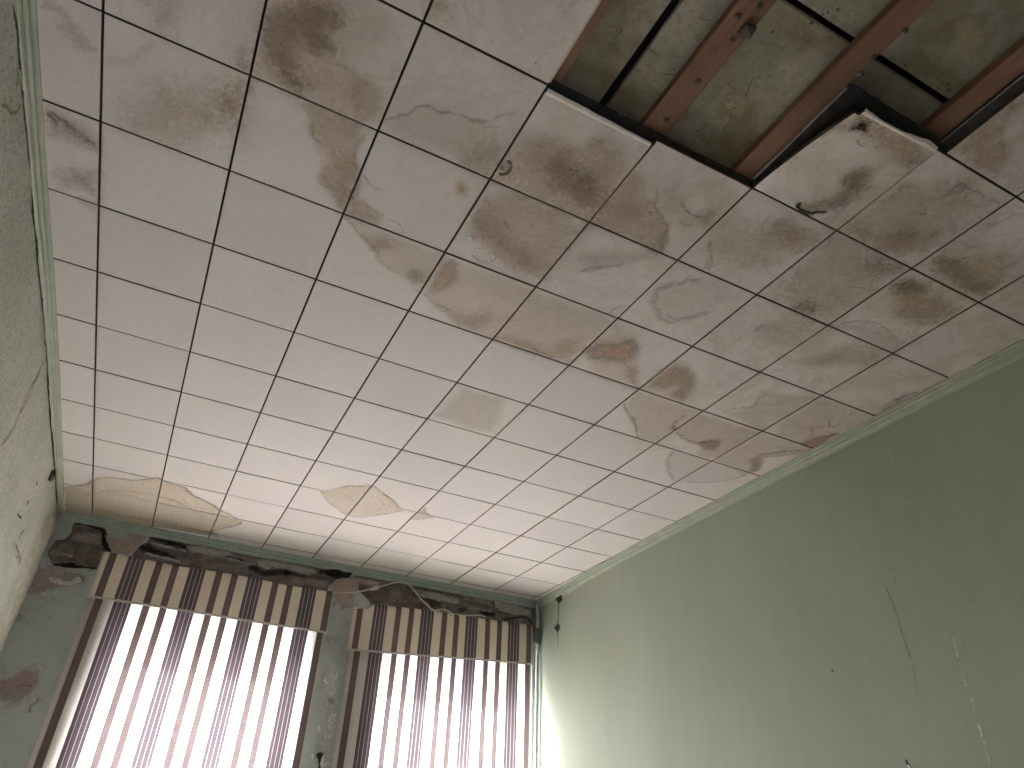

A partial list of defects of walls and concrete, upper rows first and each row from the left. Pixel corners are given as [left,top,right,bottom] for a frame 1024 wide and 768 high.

water stain [796,175,859,215]
flaking render [27,523,535,628]